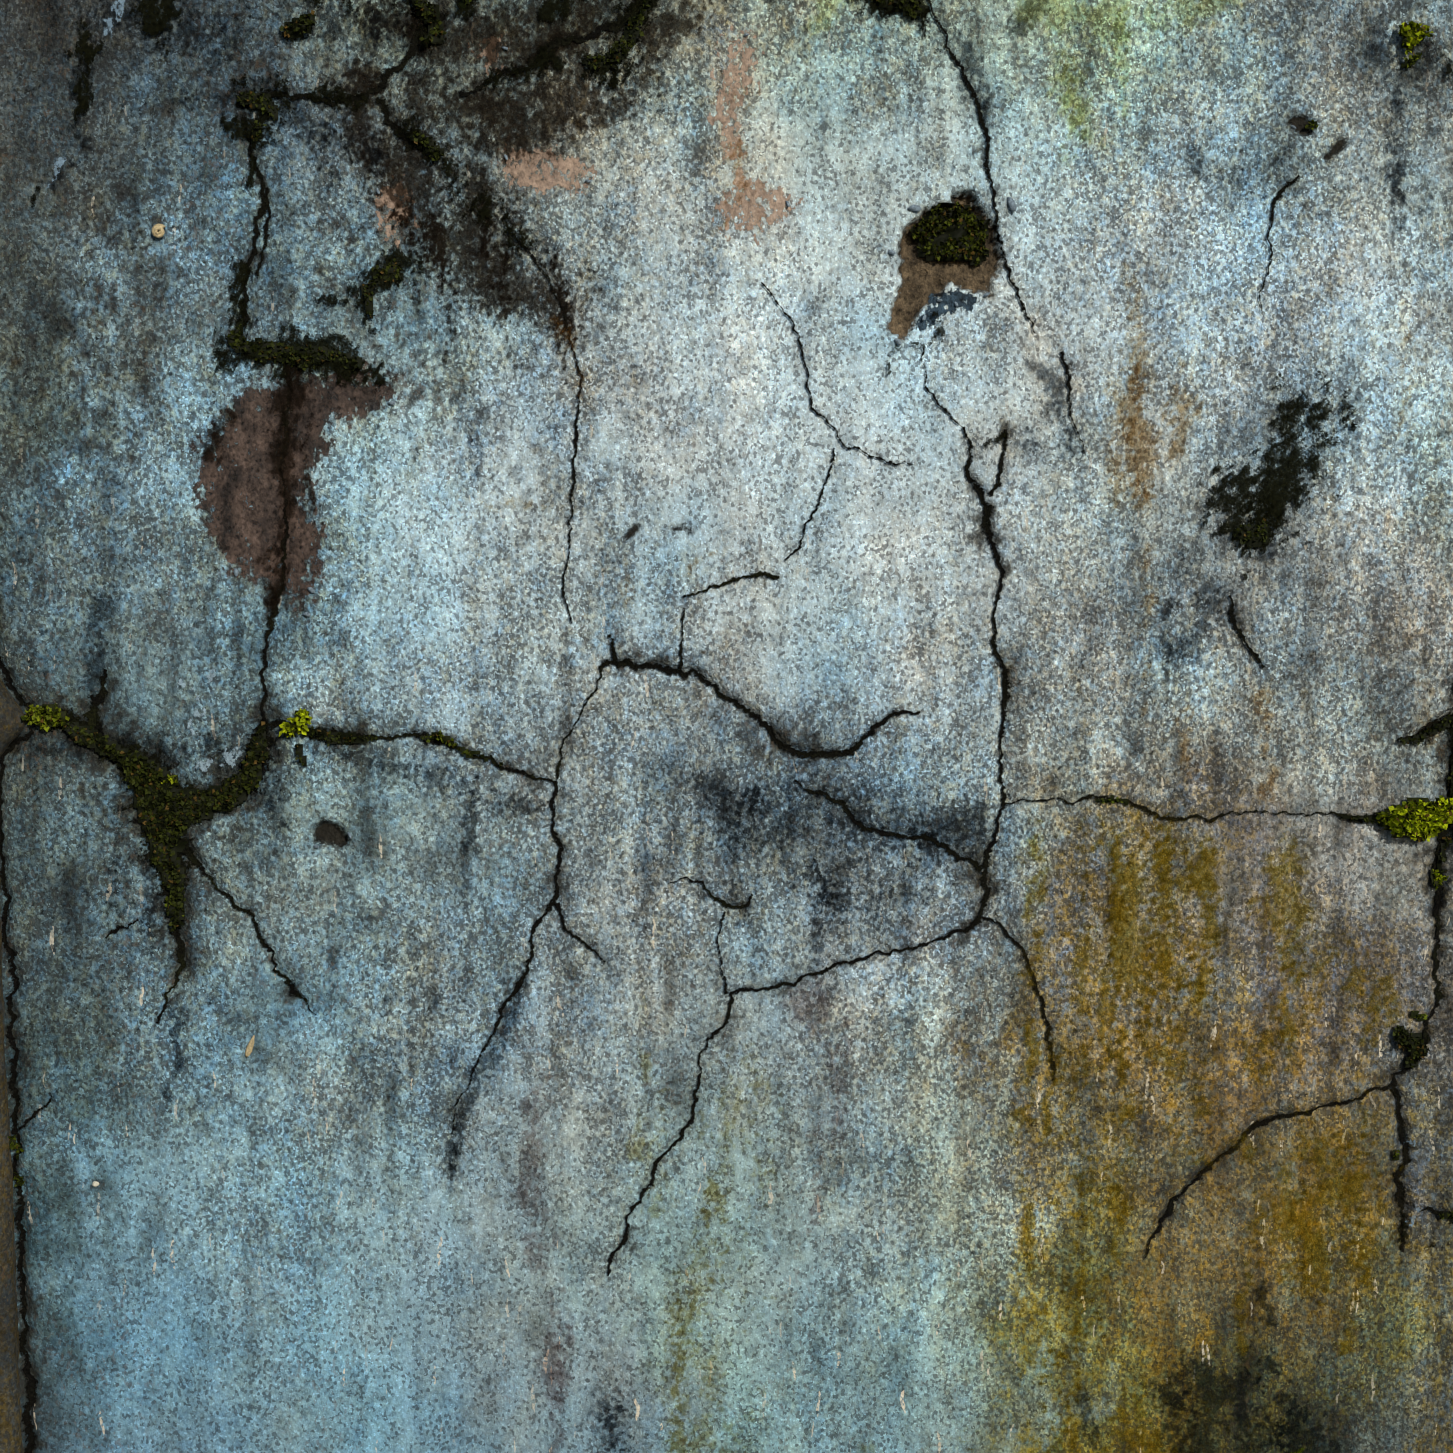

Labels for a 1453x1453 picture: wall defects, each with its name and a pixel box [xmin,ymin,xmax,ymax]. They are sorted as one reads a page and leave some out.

crack [236,11,446,323]
crack [458,0,643,97]
spalling [887,191,1001,345]
crack [928,0,1085,453]
crack [1259,174,1300,311]
peeling [185,359,414,623]
leakage [1187,370,1360,580]
crack [0,232,1376,1453]
crack [1143,683,1453,1260]